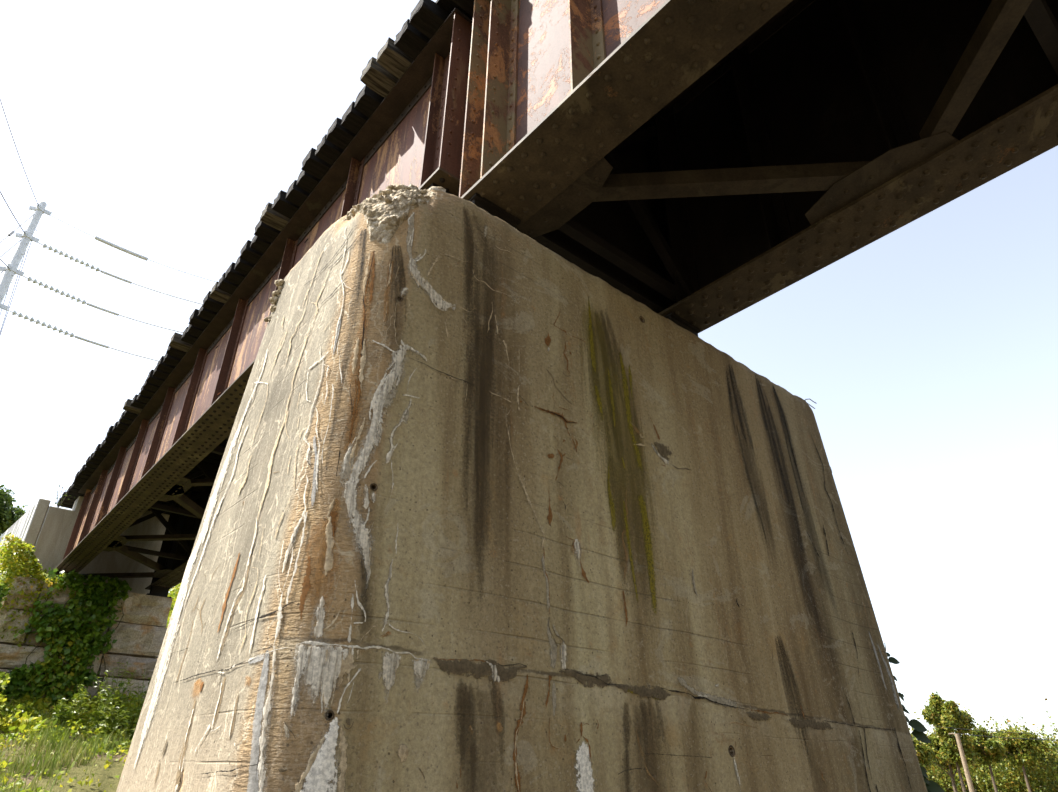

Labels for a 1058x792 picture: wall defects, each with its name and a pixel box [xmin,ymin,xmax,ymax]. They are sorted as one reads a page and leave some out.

spalling [342,184,446,264]
rust [363,251,375,310]
rust [348,338,366,443]
rust [299,556,311,619]
rust [324,497,338,575]
efflorescence [246,340,431,792]
crack [170,226,623,792]
leakage [638,496,656,613]
efflorescence [575,720,599,792]